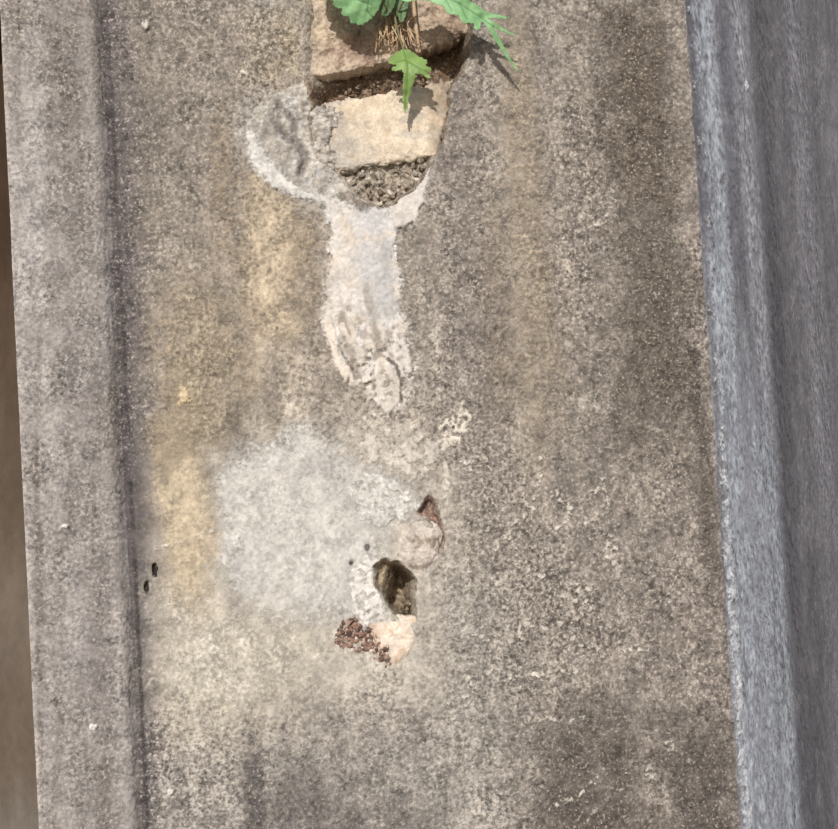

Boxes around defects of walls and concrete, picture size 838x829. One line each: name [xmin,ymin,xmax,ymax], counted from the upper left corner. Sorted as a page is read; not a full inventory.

leakage [148,285,321,722]
leakage [240,170,316,338]
flaking render [224,0,473,668]